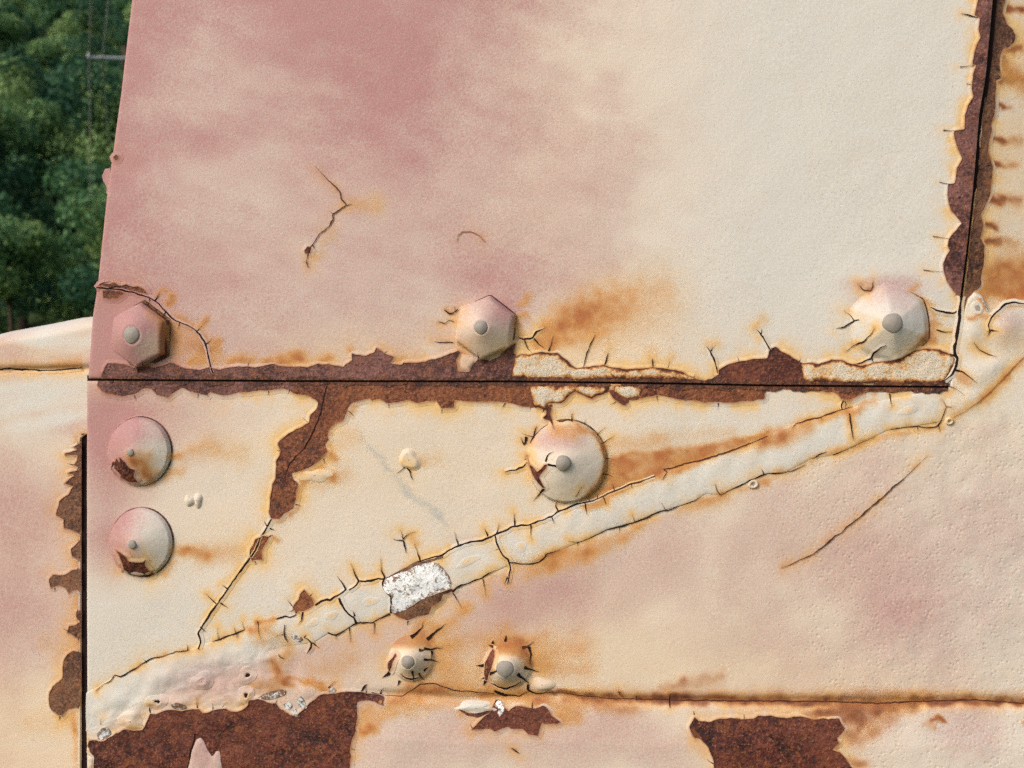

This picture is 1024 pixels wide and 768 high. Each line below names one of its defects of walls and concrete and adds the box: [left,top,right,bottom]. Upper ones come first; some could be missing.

crack [96,281,214,373]
crack [306,166,351,267]
corrosion [94,278,967,565]
corrosion [45,441,1024,768]
crack [96,296,1024,691]
crack [361,621,1024,715]
corrosion [939,0,1024,320]